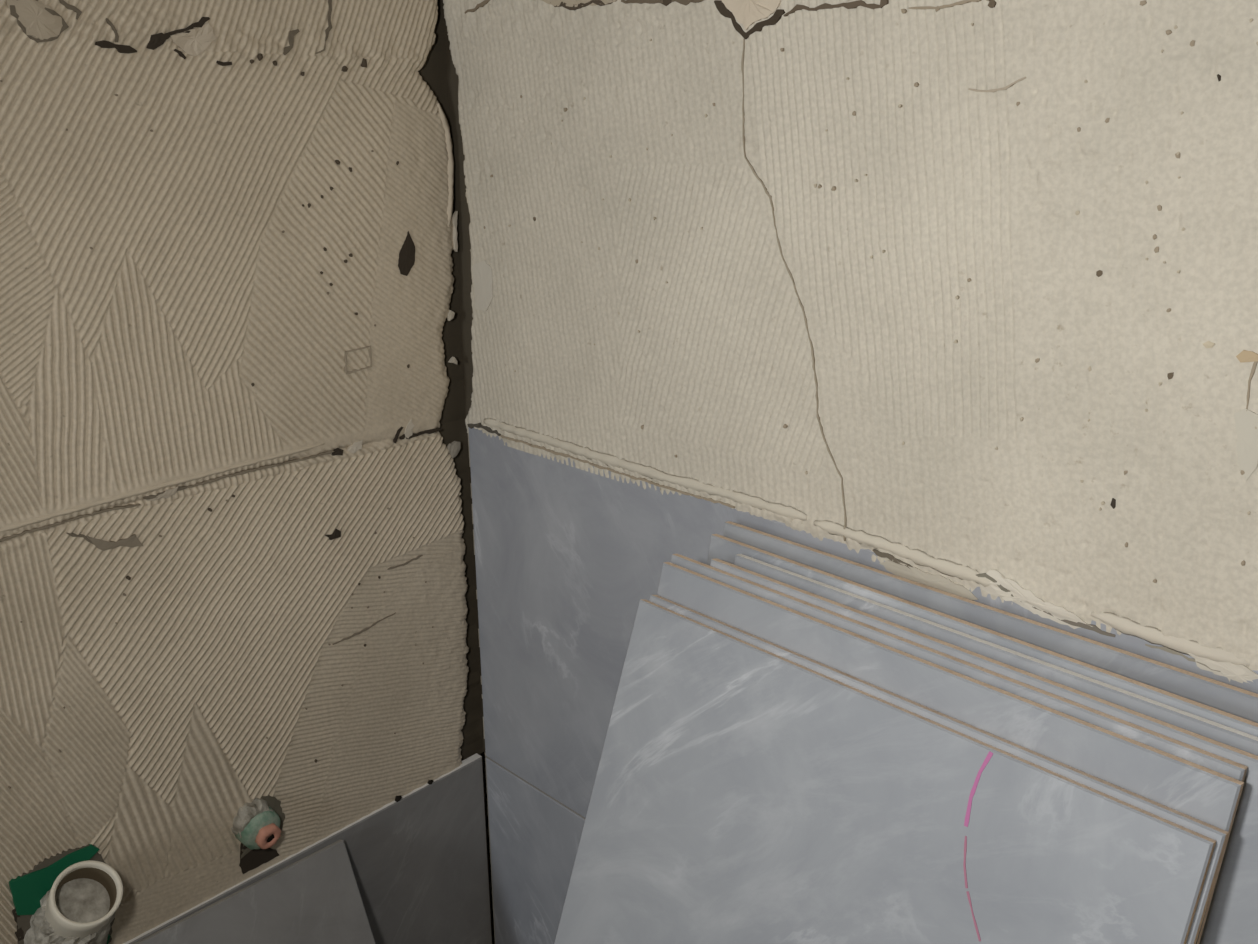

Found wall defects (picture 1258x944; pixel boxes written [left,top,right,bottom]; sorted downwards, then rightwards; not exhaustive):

crack [550,0,982,568]
crack [1246,361,1258,411]
crack [0,450,334,544]